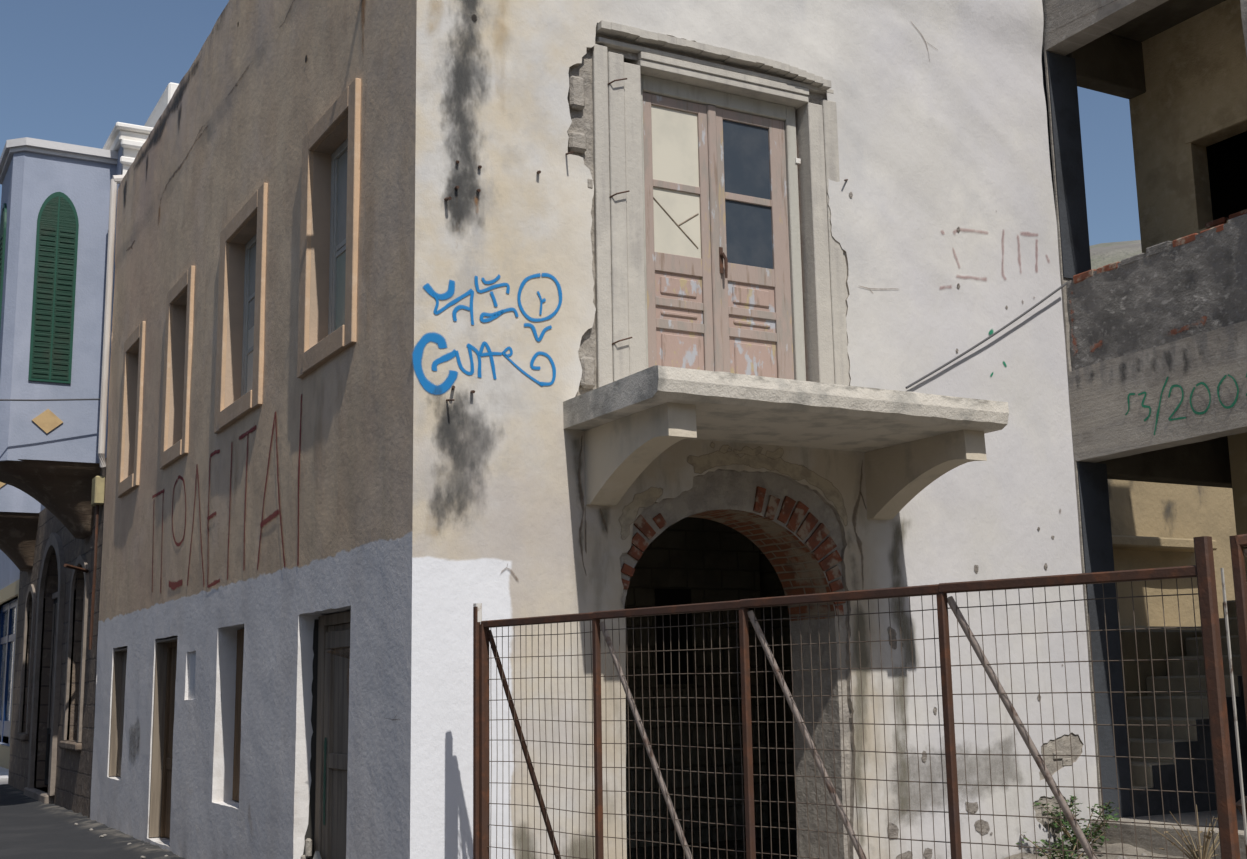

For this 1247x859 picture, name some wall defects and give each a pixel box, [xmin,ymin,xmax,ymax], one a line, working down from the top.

water stain [449,0,484,224]
spalling [808,92,824,105]
crack [159,127,207,203]
spalling [567,34,782,397]
water stain [440,406,489,509]